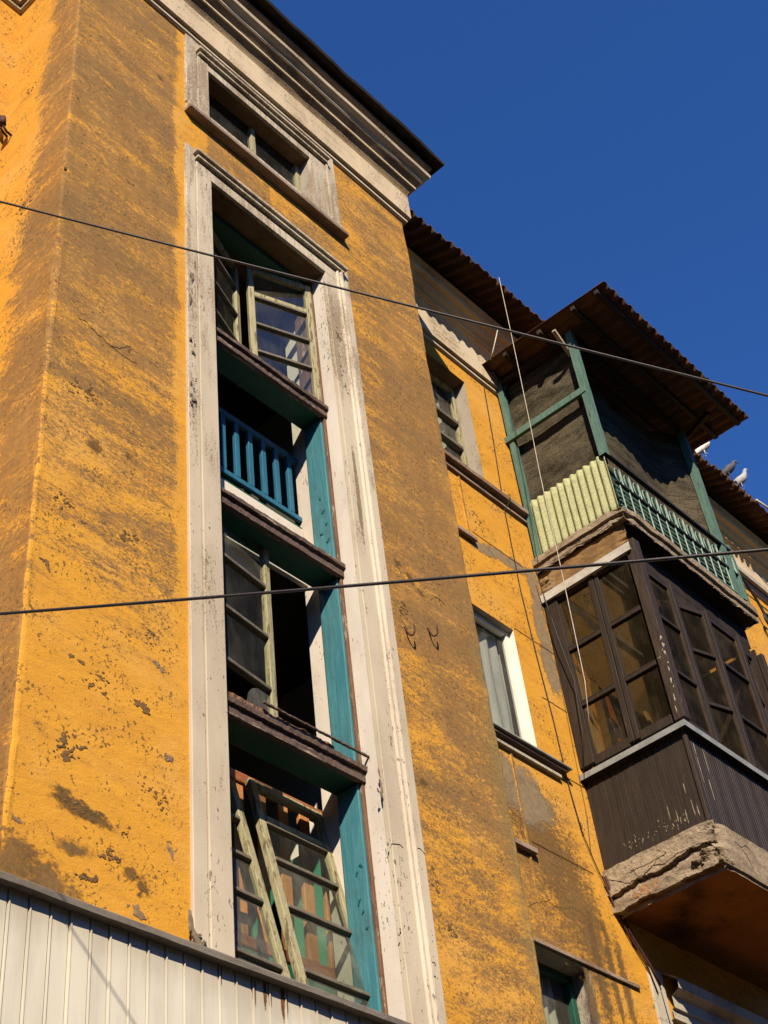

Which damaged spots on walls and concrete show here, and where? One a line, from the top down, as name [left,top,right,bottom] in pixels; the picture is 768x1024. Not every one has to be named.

crack [76,317,138,365]
peeling [68,653,110,700]
peeling [134,698,151,715]
peeling [52,731,89,762]
peeling [629,784,700,849]
peeling [99,847,121,863]
crack [609,841,754,884]
spalling [691,846,741,872]
peeling [74,872,99,883]
flaking render [632,878,658,898]
peeling [127,903,147,920]